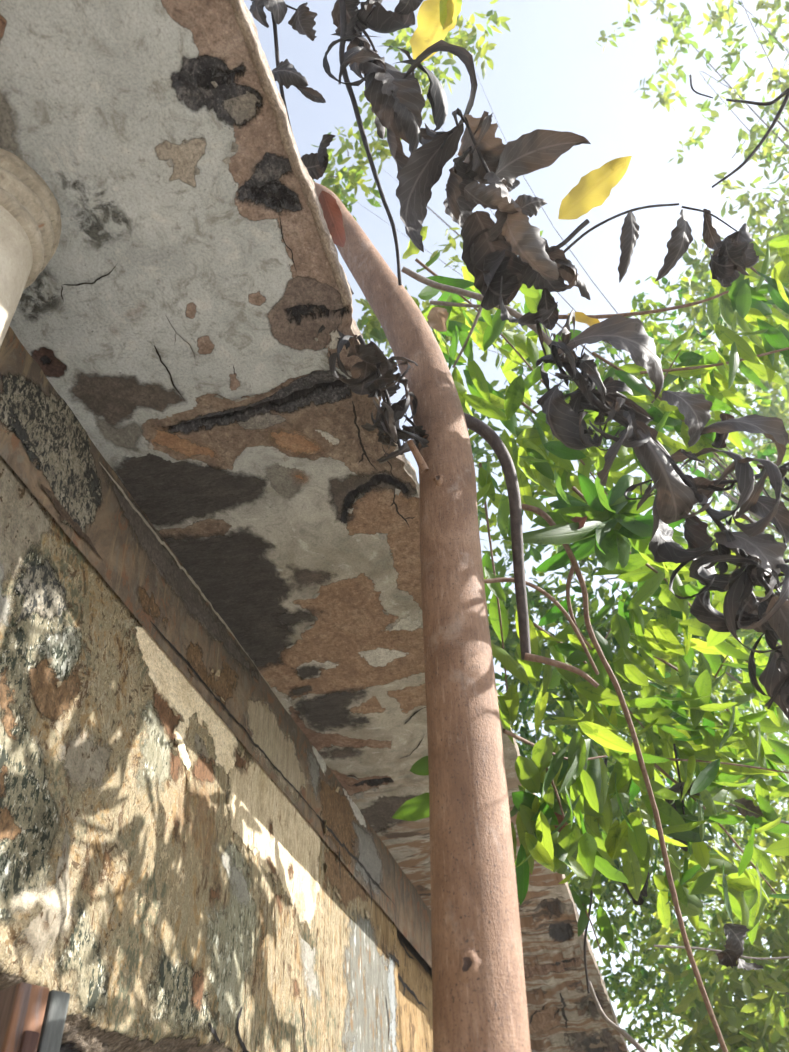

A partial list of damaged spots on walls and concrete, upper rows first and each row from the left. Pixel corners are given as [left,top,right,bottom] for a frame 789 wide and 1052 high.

crack [61,265,116,299]
flaking render [138,0,426,752]
crack [154,316,417,526]